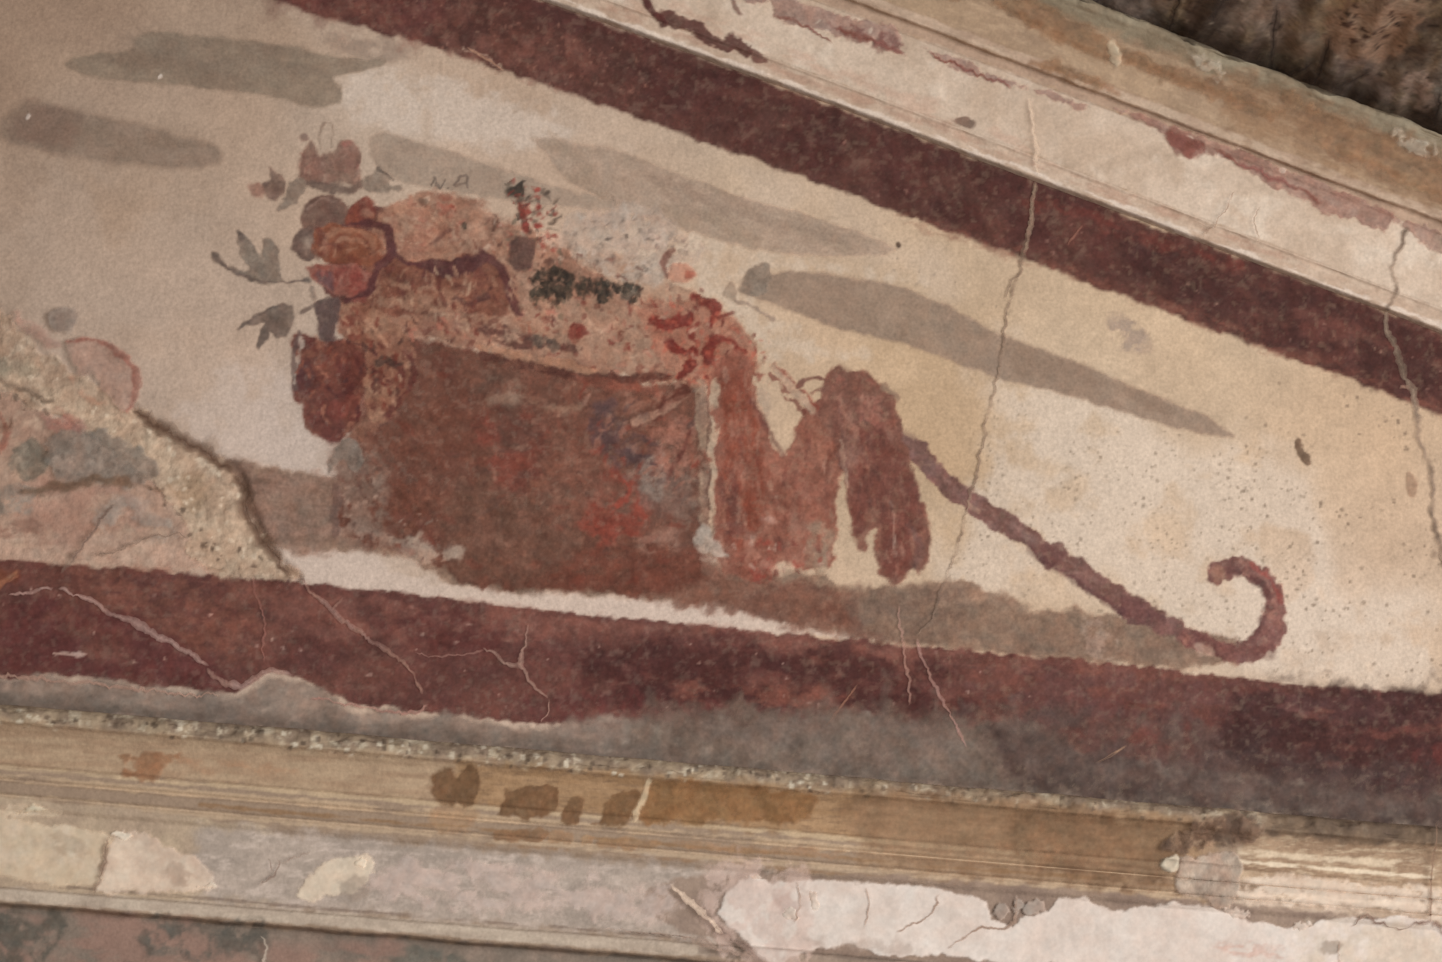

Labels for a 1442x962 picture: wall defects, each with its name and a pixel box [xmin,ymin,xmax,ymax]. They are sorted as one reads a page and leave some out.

crack [899,184,1037,742]
crack [1385,228,1442,560]
peeling [0,805,216,893]
damp [0,674,1442,889]
peeling [719,874,1442,962]